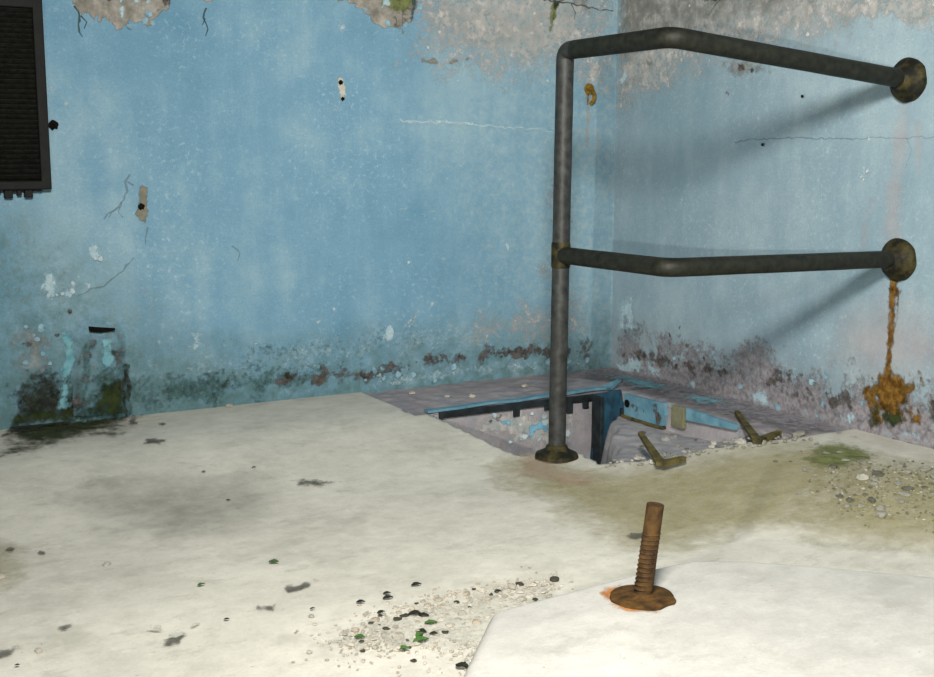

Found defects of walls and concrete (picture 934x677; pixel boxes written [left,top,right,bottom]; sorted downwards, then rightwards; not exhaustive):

peeling [72,0,170,30]
peeling [338,0,606,79]
peeling [578,56,610,84]
peeling [618,48,710,107]
peeling [619,0,934,42]
water stain [1,372,136,456]
peeling [275,353,466,386]
peeling [476,304,551,369]
peeling [567,297,934,467]
corrosion [862,279,923,427]